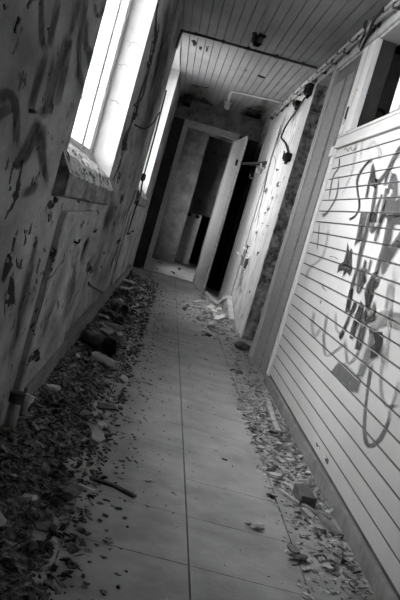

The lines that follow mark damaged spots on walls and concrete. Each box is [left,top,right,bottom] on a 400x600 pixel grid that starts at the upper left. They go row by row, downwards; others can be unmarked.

flaking render [2,237,23,316]